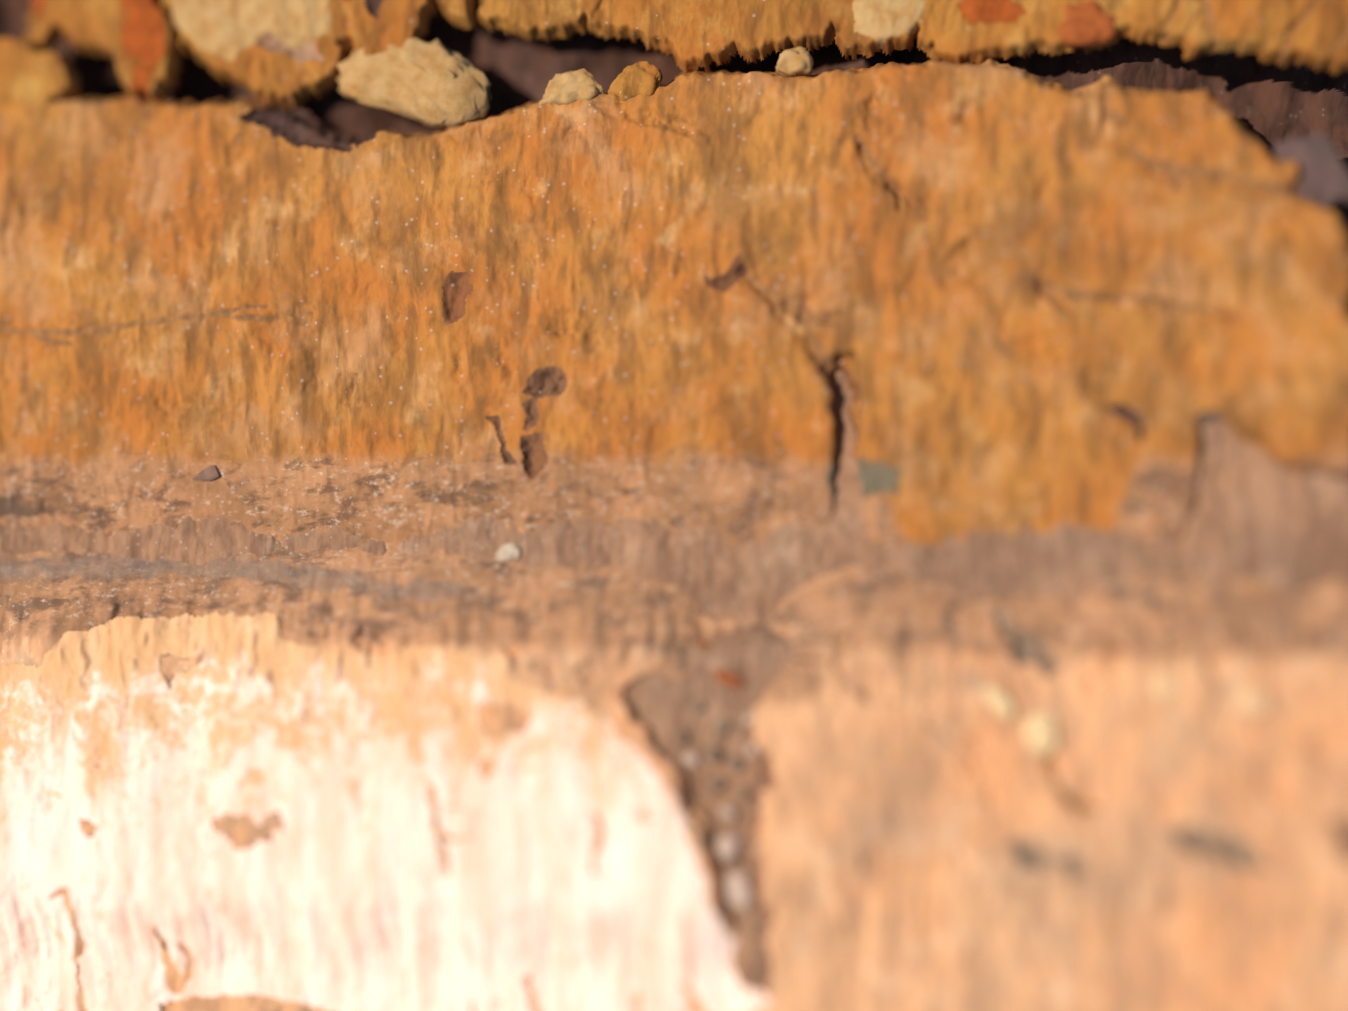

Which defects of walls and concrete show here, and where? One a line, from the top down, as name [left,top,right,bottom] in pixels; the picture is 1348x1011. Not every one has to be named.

spalling [256,32,323,63]
spalling [776,46,813,77]
spalling [239,103,392,152]
spalling [539,61,703,143]
peeling [1272,132,1348,207]
spalling [442,271,473,325]
spalling [705,253,747,293]
spalling [939,233,1007,293]
crack [744,269,839,390]